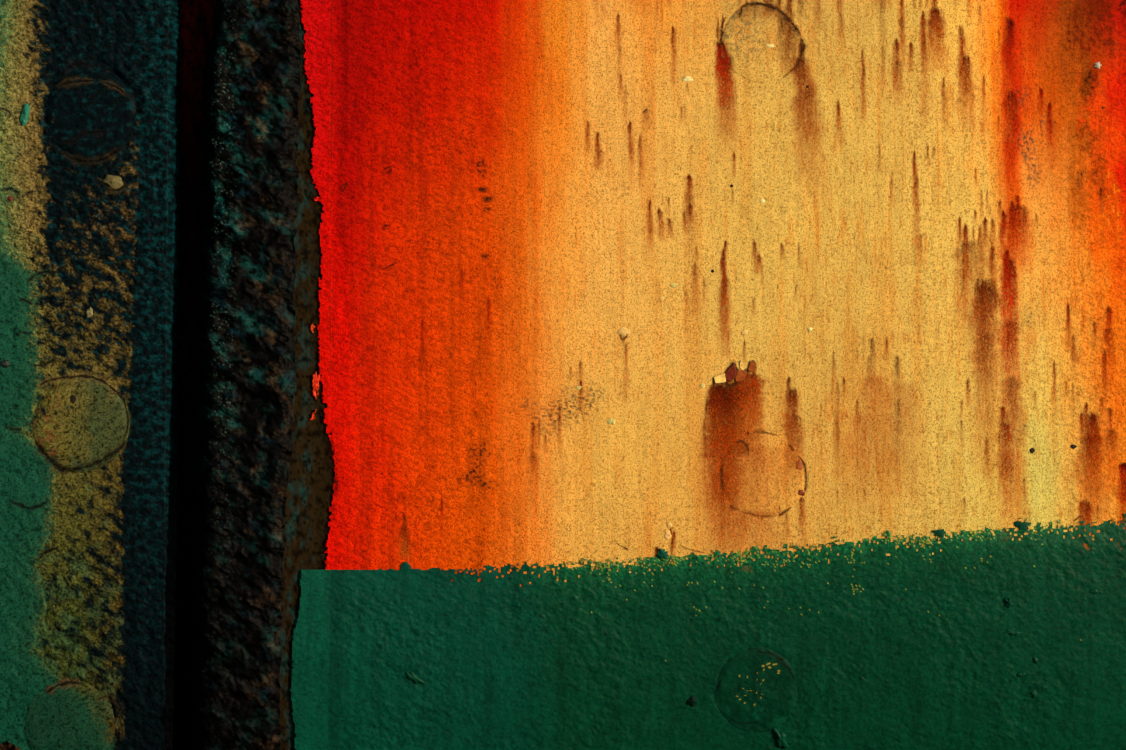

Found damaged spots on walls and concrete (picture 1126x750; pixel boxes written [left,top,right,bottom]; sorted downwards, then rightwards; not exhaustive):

corrosion [716,15,733,107]
corrosion [766,0,814,118]
corrosion [893,0,944,78]
corrosion [959,26,985,107]
corrosion [998,19,1018,178]
corrosion [649,175,693,231]
corrosion [959,196,1028,460]
corrosion [1093,307,1112,382]
corrosion [704,373,764,516]
corrosion [784,377,798,444]
corrosion [1079,400,1112,546]
spalling [0,740,20,750]